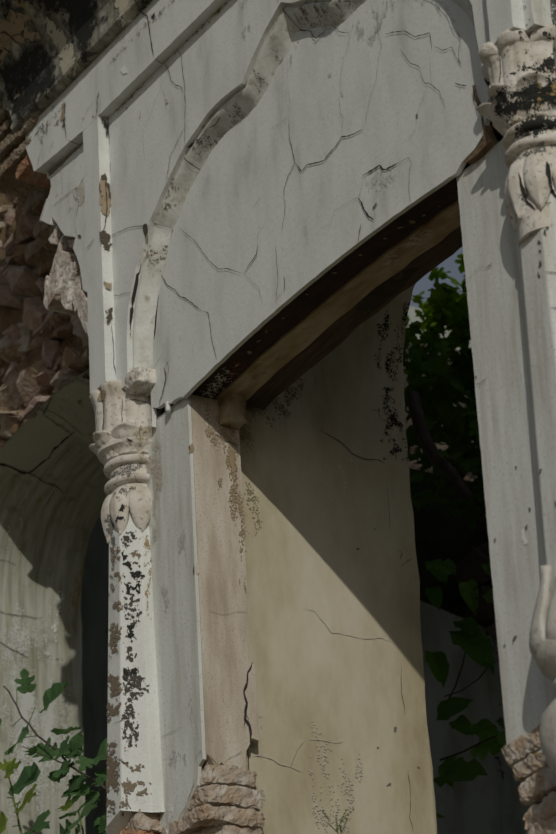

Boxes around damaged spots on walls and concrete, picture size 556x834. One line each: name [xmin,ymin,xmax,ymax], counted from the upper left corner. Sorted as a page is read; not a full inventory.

damp [0,0,106,146]
crack [37,72,79,166]
crack [135,0,185,101]
crack [165,116,221,182]
crack [272,5,483,240]
crack [53,168,285,299]
crack [111,266,141,374]
crack [161,275,216,355]
mould [374,302,410,461]
crack [0,431,75,504]
crack [227,662,301,771]